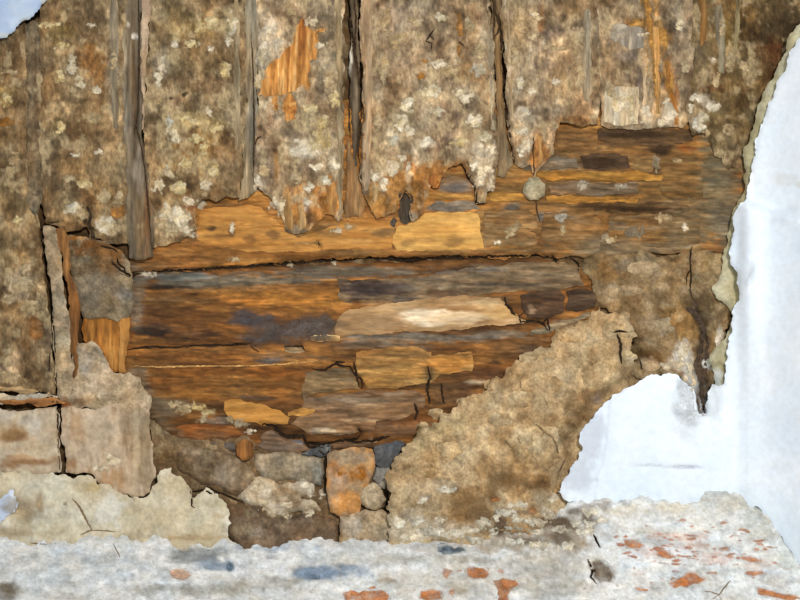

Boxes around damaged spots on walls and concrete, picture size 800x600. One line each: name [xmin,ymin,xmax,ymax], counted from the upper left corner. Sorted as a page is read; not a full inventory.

peeling [171,10,239,52]
peeling [150,158,220,238]
peeling [165,102,227,155]
peeling [371,155,412,191]
spalling [390,190,414,227]
peeling [373,73,445,146]
peeling [450,114,496,191]
crack [102,242,580,277]
crack [40,221,60,470]
peeling [168,400,214,423]
crack [414,366,445,420]
peeling [297,479,325,517]